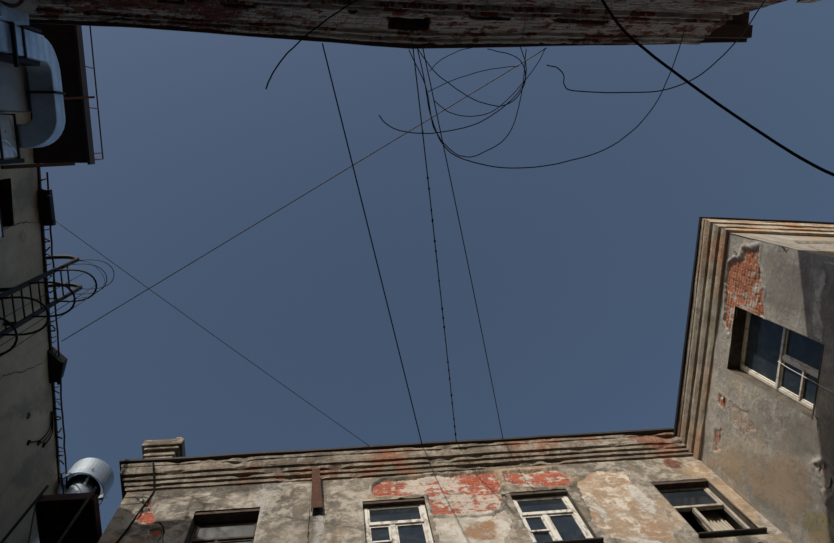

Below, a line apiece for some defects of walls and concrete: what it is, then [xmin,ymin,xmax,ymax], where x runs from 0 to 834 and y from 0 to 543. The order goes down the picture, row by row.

spalling [387,16,430,31]
flaking render [724,248,764,331]
flaking render [373,470,675,543]
flaking render [816,463,834,497]